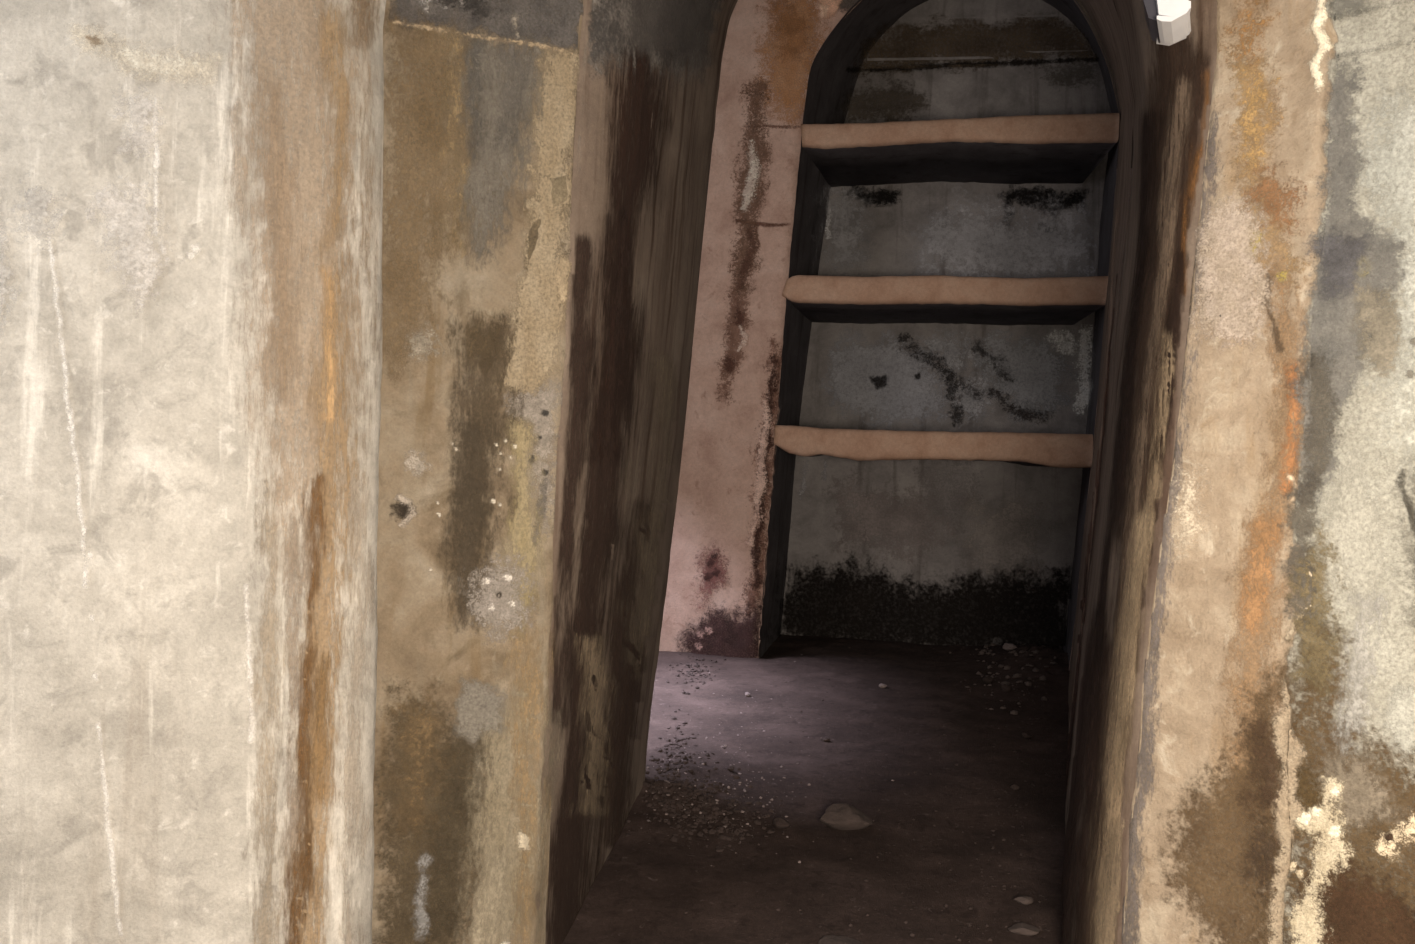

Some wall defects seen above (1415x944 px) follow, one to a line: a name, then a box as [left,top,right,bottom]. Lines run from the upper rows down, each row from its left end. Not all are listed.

water stain [230,0,677,944]
rust [754,0,827,124]
water stain [677,0,1415,944]
rust [1221,270,1309,787]
spalling [1281,0,1415,944]